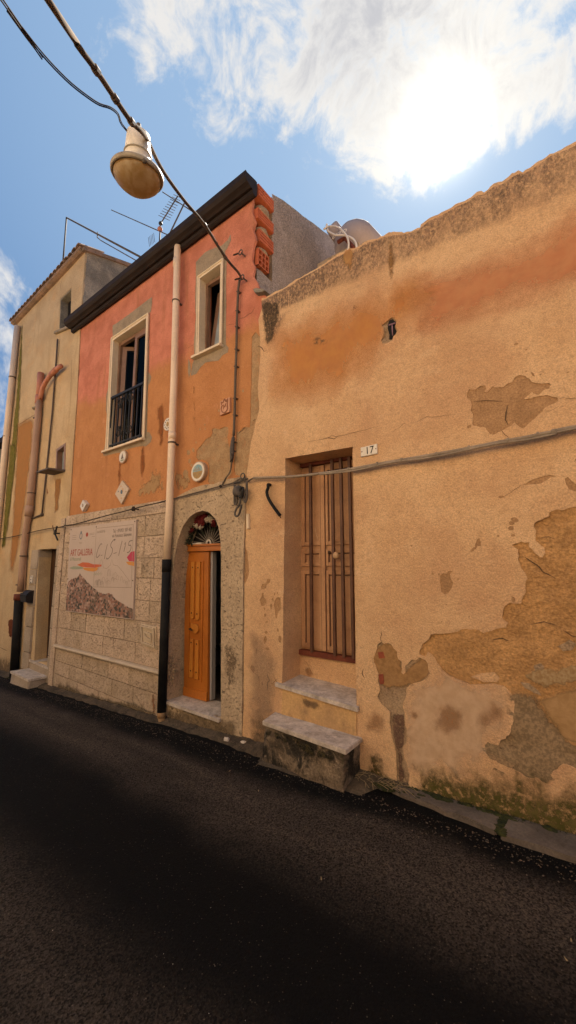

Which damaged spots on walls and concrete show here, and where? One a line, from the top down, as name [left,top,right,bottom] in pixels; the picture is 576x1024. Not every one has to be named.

water stain [261,146,576,344]
peeling [139,332,260,496]
peeling [467,371,558,435]
peeling [374,507,576,783]